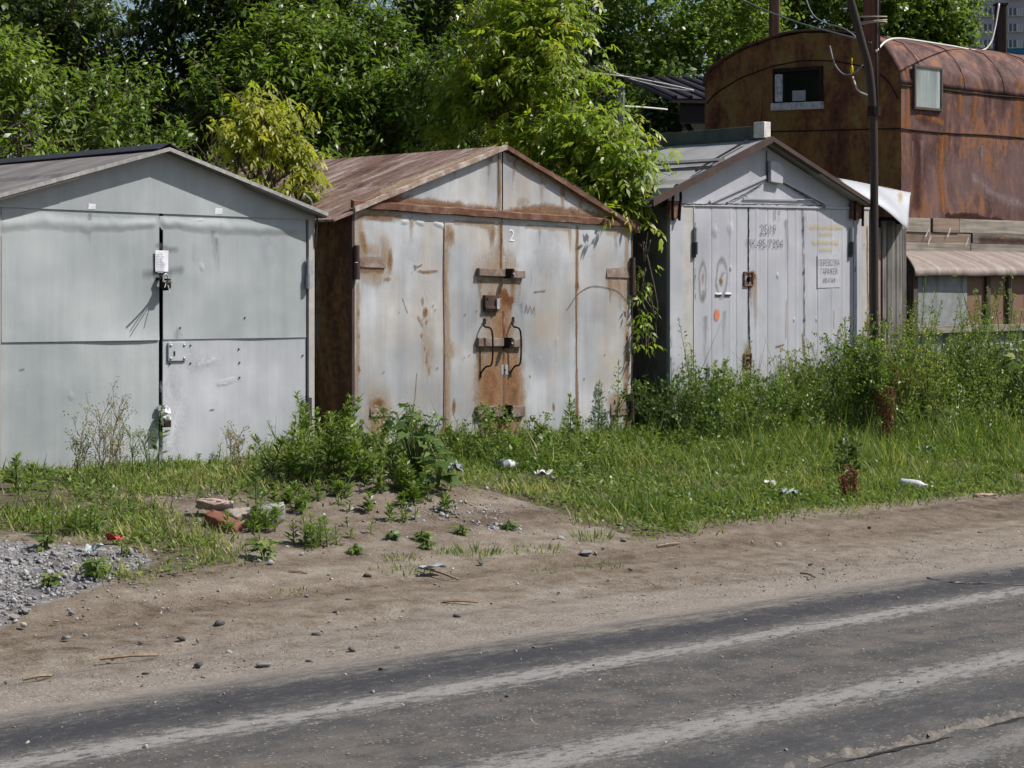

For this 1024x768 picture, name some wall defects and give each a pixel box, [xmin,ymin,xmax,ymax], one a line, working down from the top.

rust [899,67,928,209]
rust [356,148,631,438]